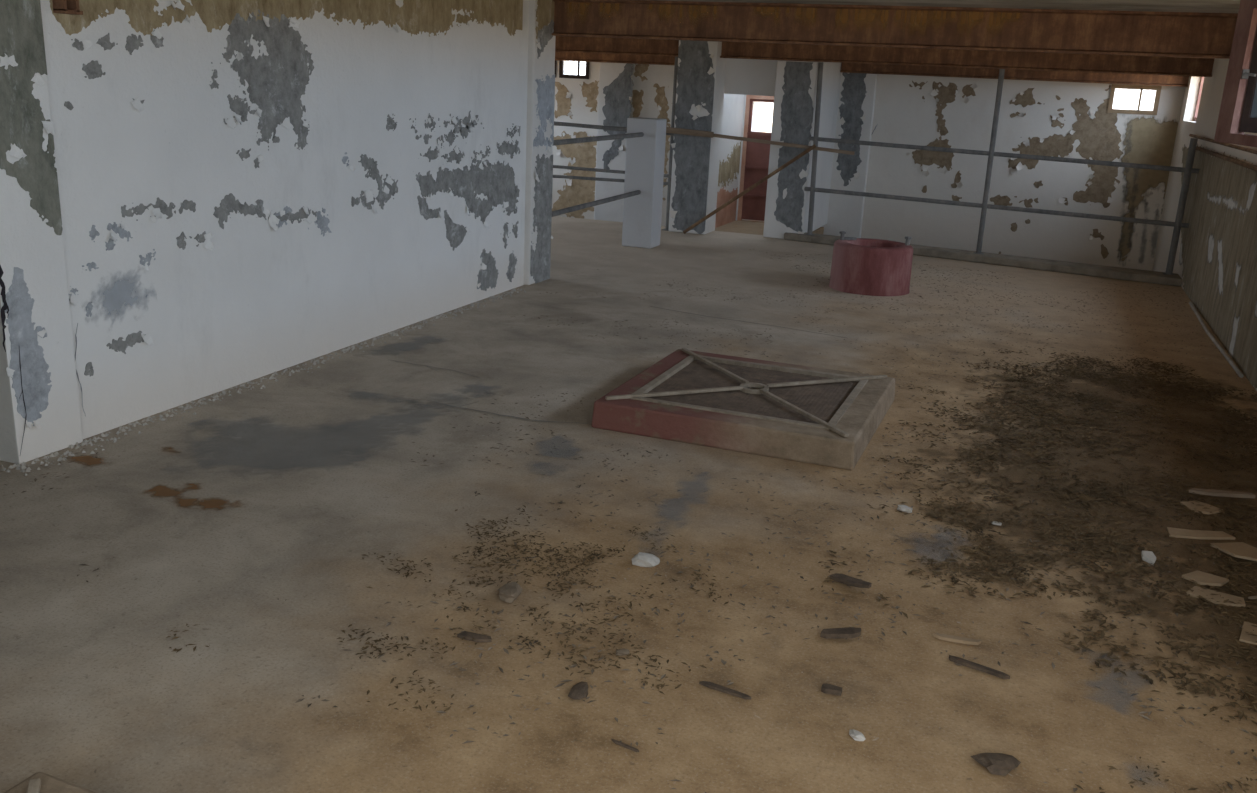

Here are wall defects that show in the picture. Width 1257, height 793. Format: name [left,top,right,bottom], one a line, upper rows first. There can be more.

peeling [89,197,196,251]
peeling [176,193,332,250]
peeling [0,0,555,235]
peeling [386,40,741,291]
peeling [772,61,814,234]
peeling [836,73,867,186]
peeling [907,81,978,201]
peeling [990,85,1123,232]
peeling [1180,143,1257,390]
peeling [5,267,52,429]
peeling [106,331,154,354]
rust [145,483,238,510]